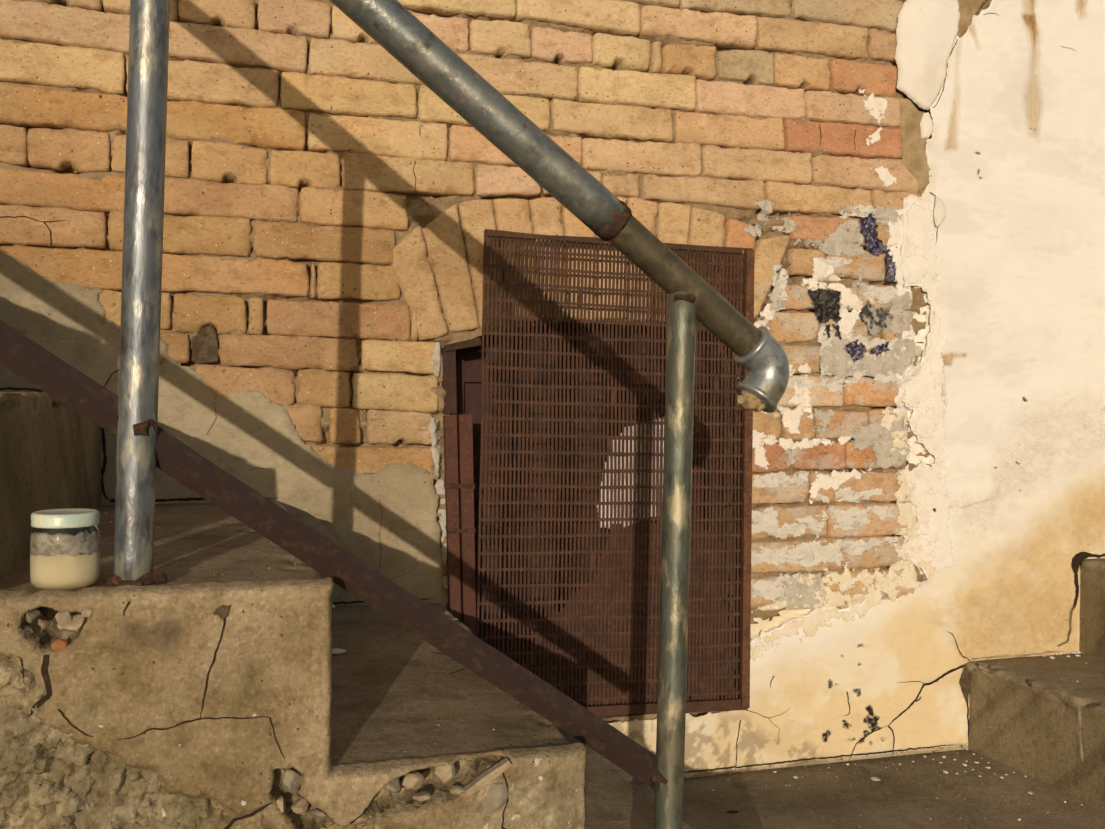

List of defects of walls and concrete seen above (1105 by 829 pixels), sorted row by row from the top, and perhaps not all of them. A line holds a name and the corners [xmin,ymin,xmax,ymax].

spalling [191,325,218,364]
peeling [750,85,954,662]
crack [101,428,115,502]
spalling [16,607,92,651]
crack [20,655,92,737]
spalling [0,660,268,829]
crack [118,618,284,758]
spalling [213,604,231,620]
water stain [842,705,883,743]
crack [684,553,1105,773]
spalling [273,753,504,829]
crack [493,756,509,829]